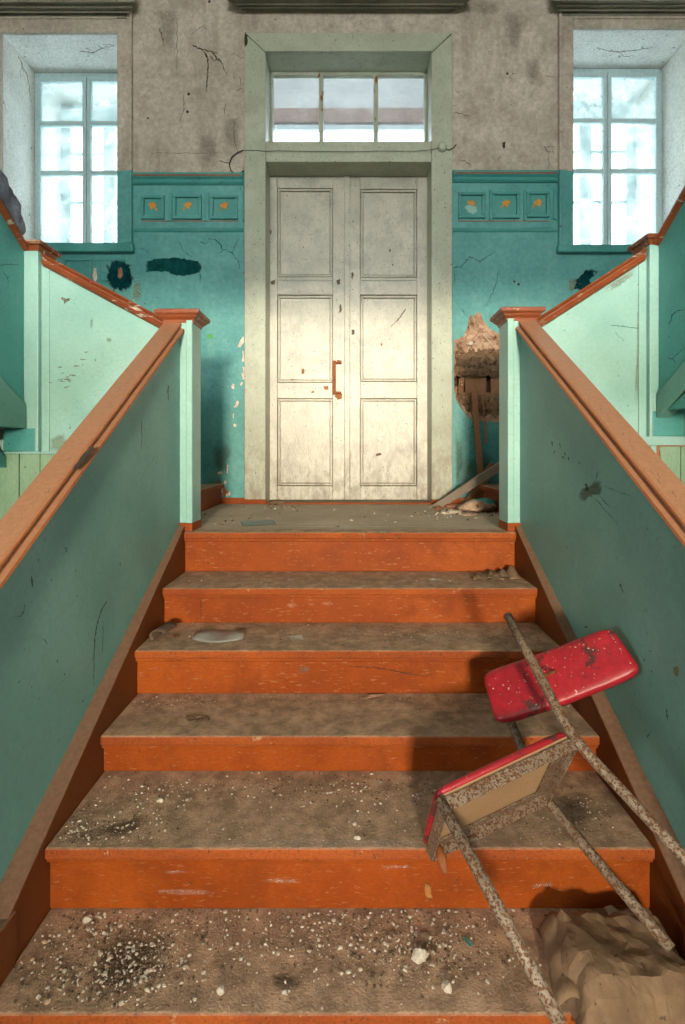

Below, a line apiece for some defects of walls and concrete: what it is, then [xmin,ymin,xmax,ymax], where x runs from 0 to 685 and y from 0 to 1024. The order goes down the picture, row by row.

crack [153,19,242,154]
crack [179,238,240,268]
peeling [231,337,244,427]